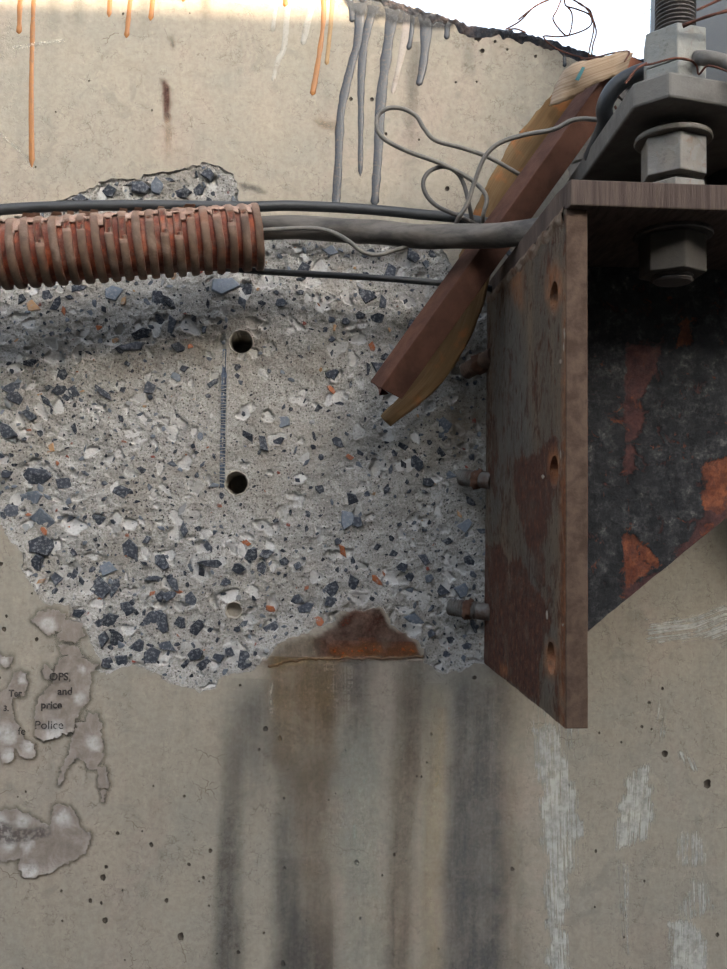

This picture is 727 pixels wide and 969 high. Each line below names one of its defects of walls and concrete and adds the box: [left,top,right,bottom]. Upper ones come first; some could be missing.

spalling [16,163,238,219]
spalling [0,239,487,692]
rust [272,609,418,662]
damp [447,691,504,969]